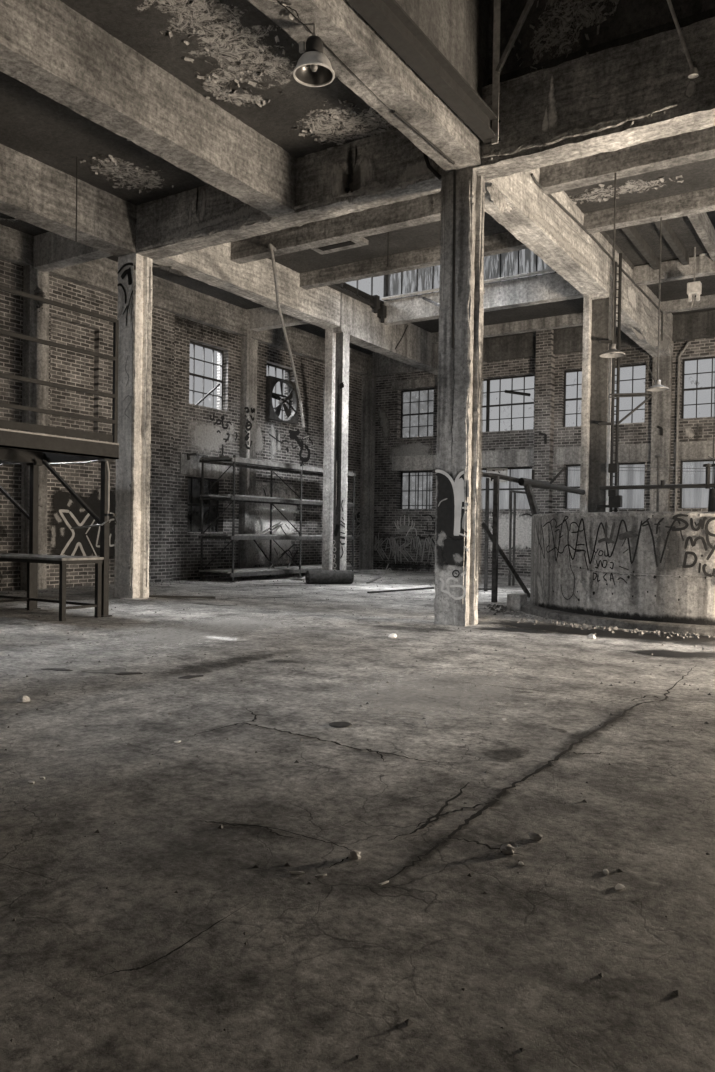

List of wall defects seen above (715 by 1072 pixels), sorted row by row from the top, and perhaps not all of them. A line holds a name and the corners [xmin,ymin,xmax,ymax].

peeling [137,0,299,107]
peeling [80,155,174,193]
peeling [294,100,396,151]
crack [186,666,696,881]